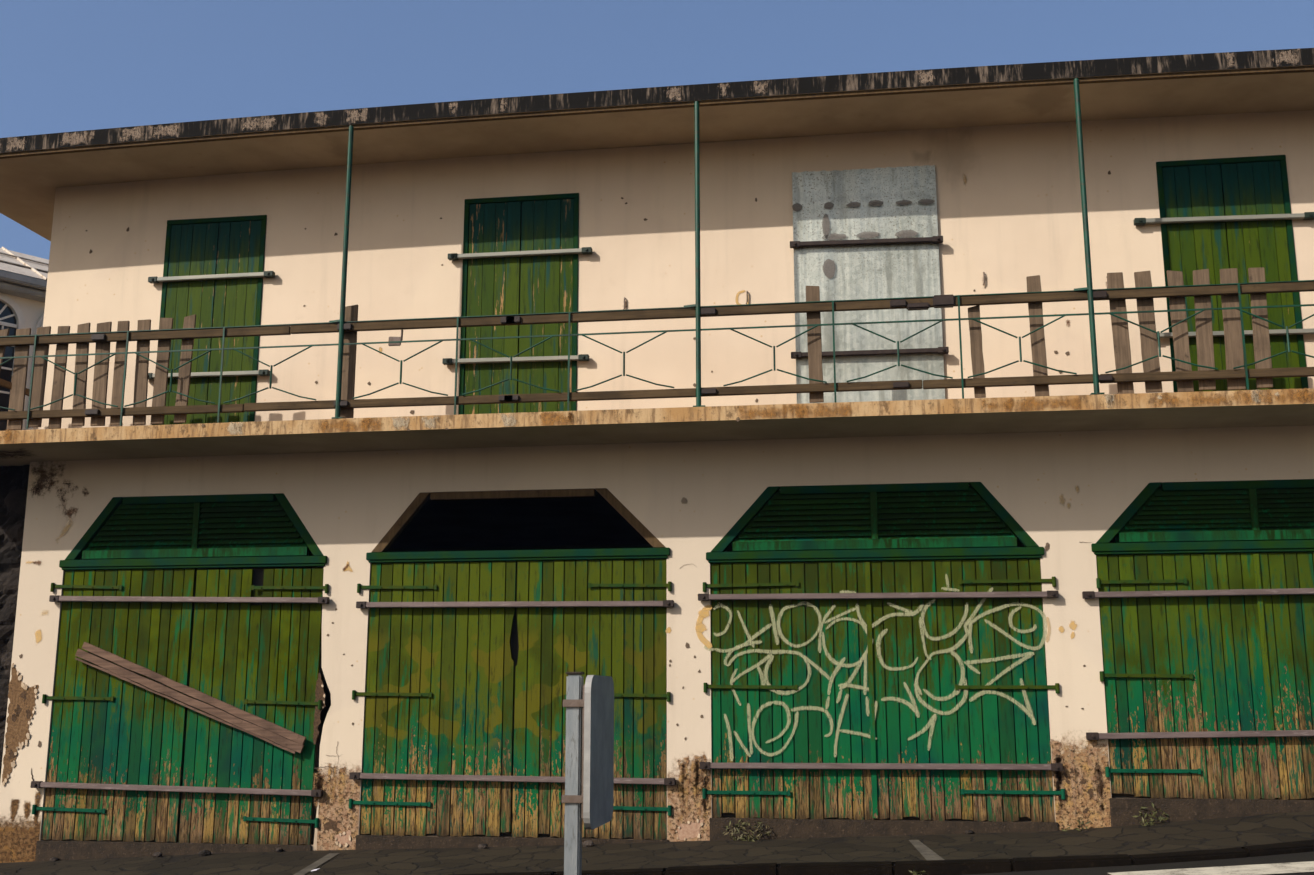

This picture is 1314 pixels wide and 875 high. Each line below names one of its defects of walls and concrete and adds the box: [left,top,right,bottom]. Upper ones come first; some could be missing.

flaking render [2,654,41,786]
flaking render [322,819,352,847]
flaking render [675,819,703,841]